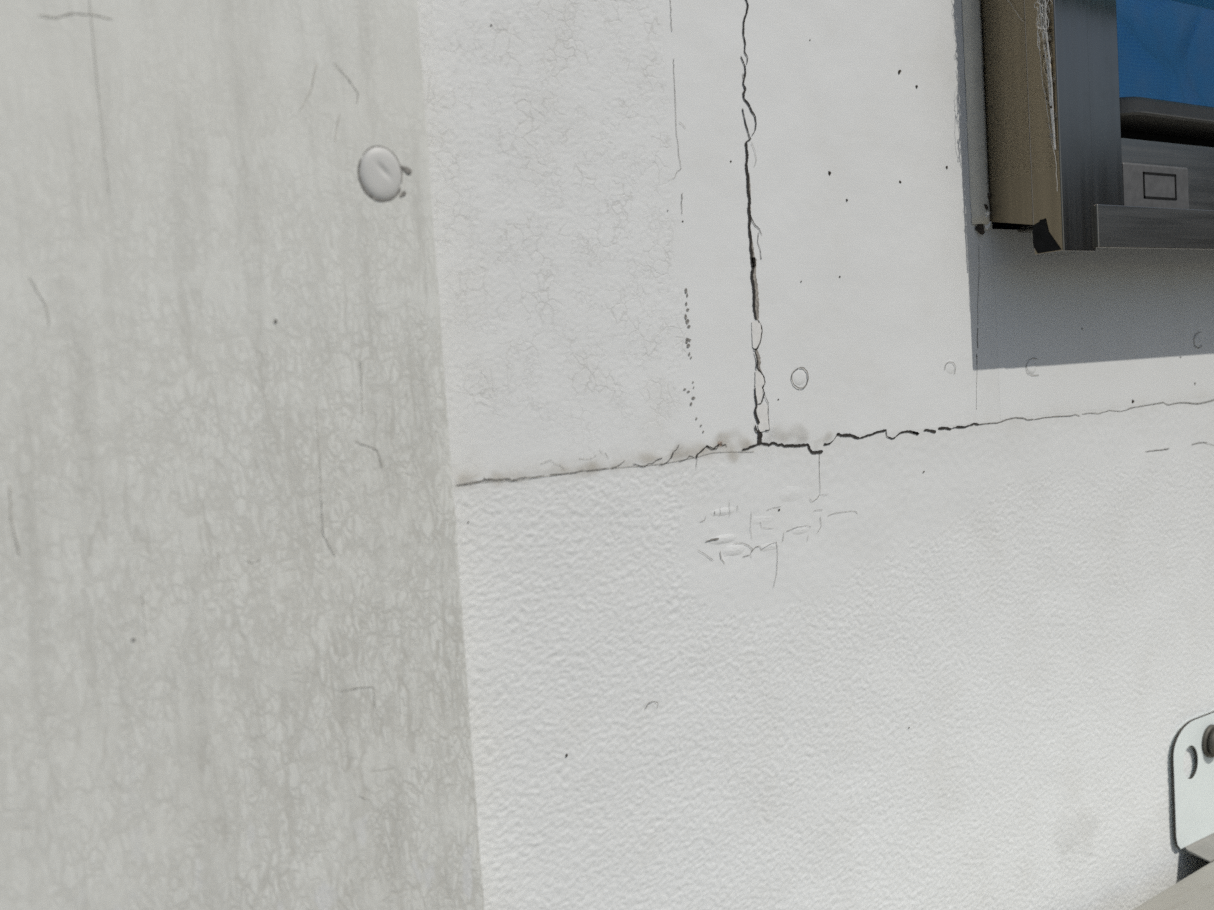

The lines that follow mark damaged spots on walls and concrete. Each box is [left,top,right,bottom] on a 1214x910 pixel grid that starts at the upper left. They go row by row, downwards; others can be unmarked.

crack [456,0,1214,486]